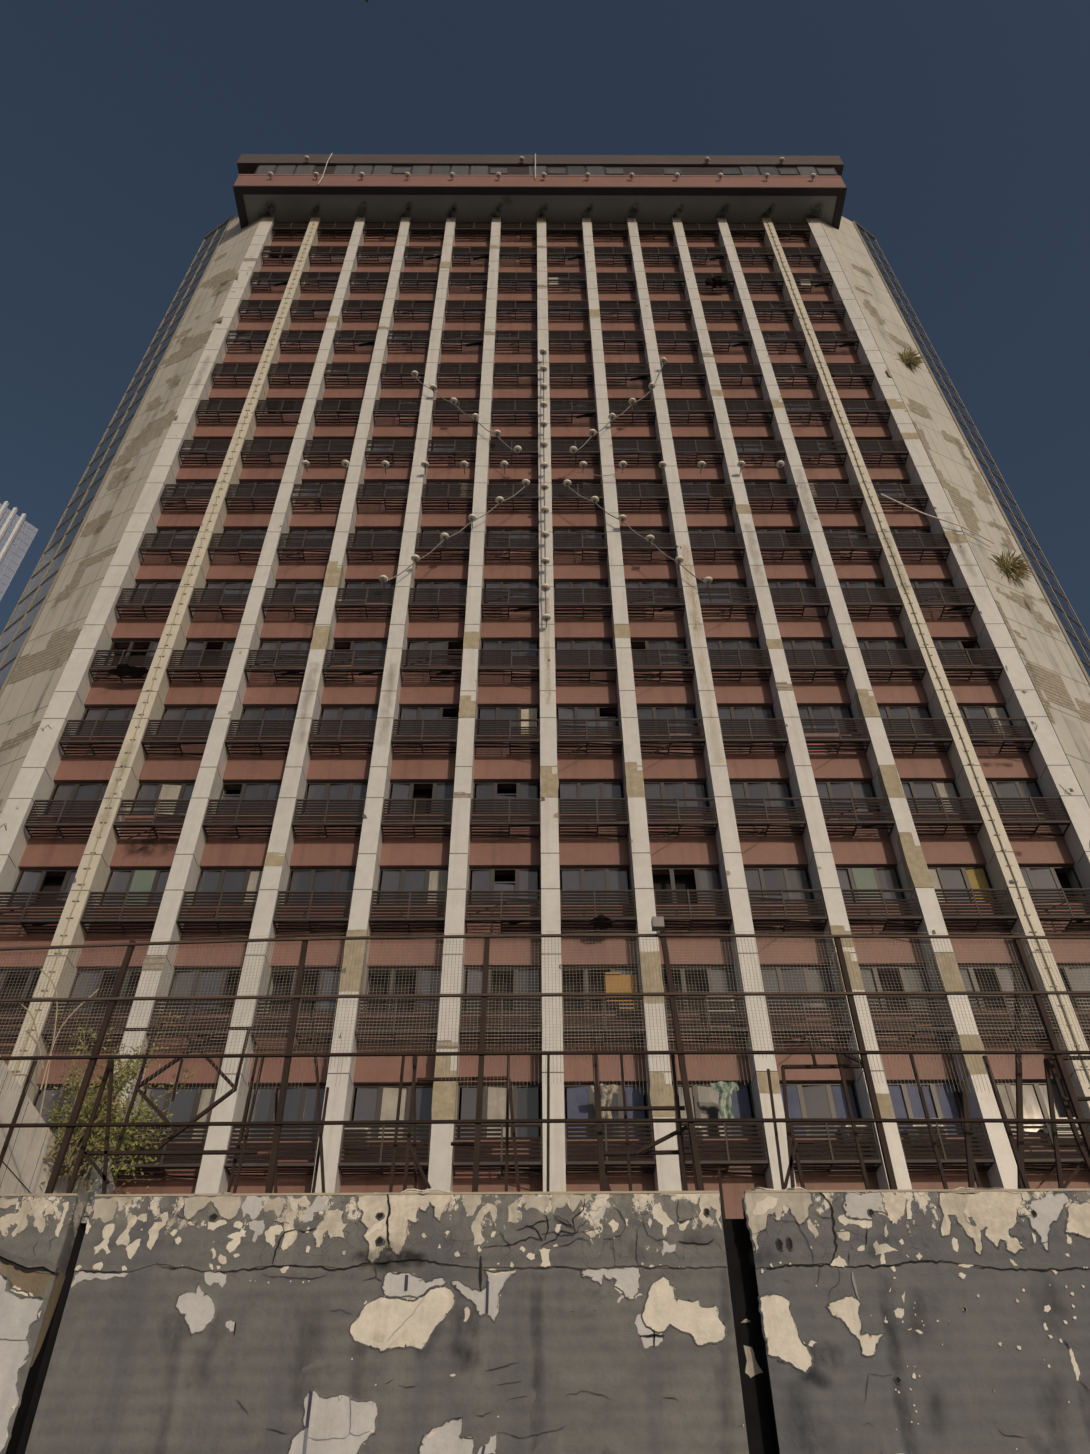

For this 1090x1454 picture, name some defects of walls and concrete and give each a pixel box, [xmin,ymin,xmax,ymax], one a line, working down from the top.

peeling [0,1188,628,1454]
crack [0,1199,726,1314]
crack [478,1362,608,1438]
peeling [580,1187,819,1378]
peeling [825,1191,980,1358]
crack [752,1192,1090,1300]
peeling [938,1187,1090,1389]